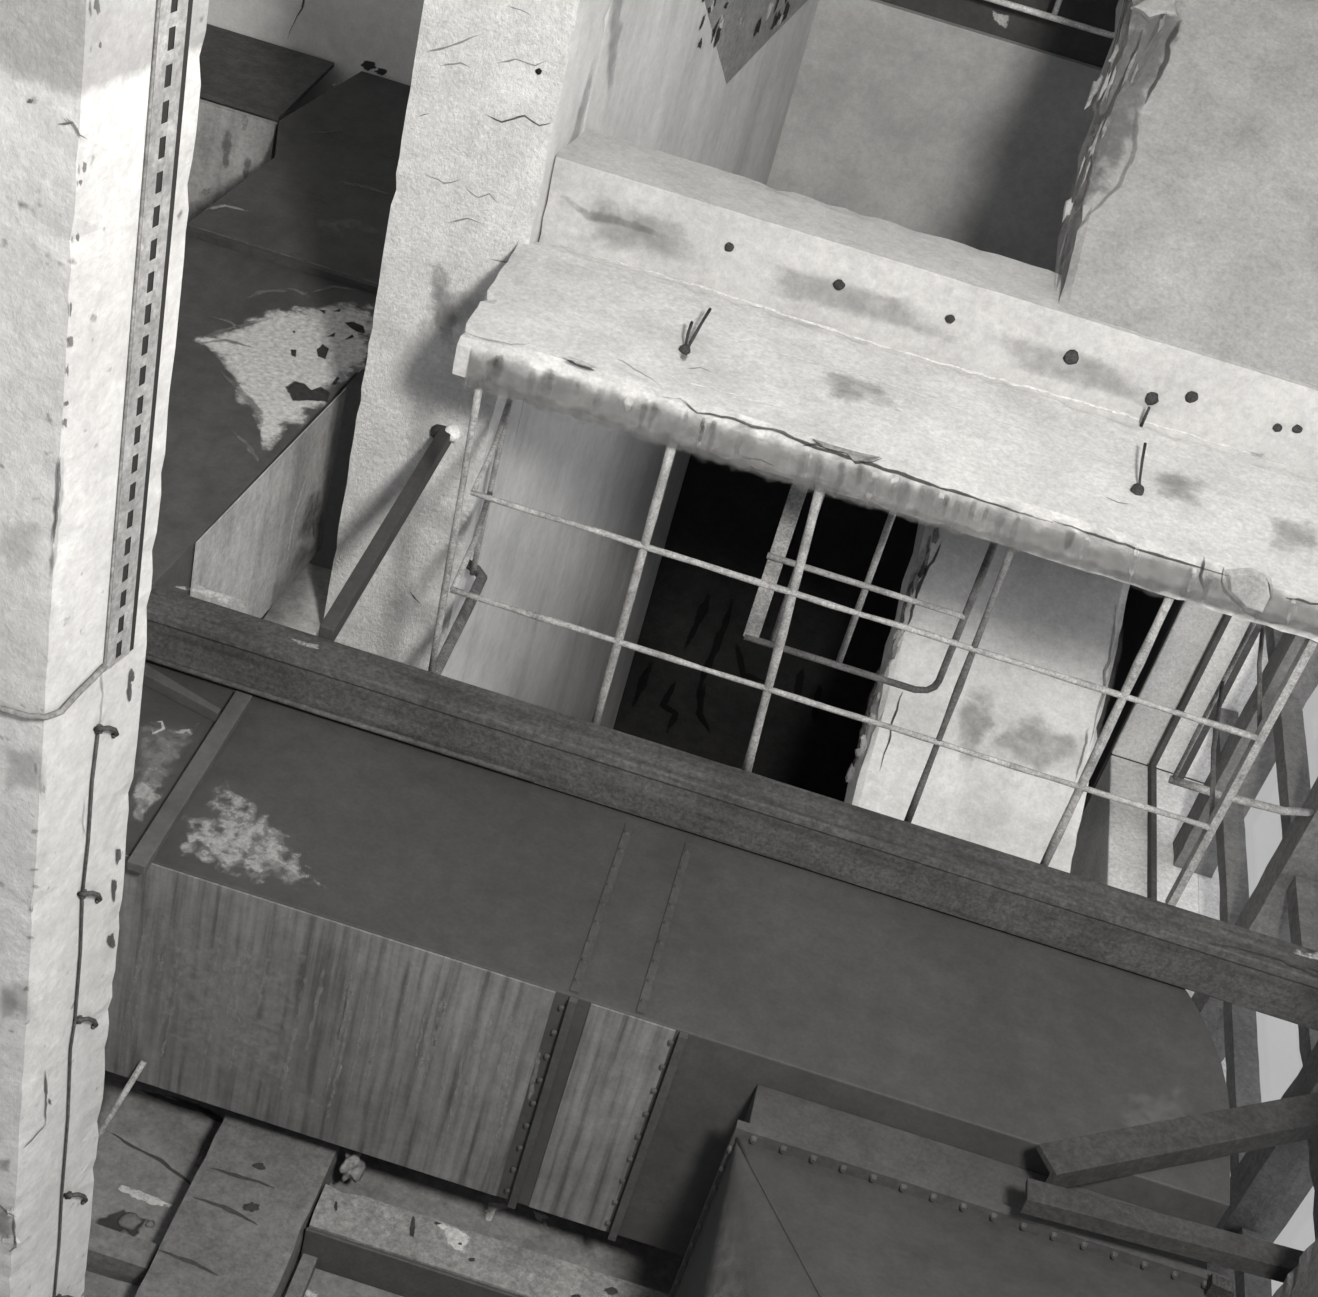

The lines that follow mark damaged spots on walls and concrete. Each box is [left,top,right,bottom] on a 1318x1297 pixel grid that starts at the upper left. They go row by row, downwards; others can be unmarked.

peeling [698,0,808,84]
spalling [1057,0,1180,287]
peeling [196,285,373,458]
damp [649,271,1236,450]
spalling [845,527,941,783]
flaking render [0,1205,21,1252]